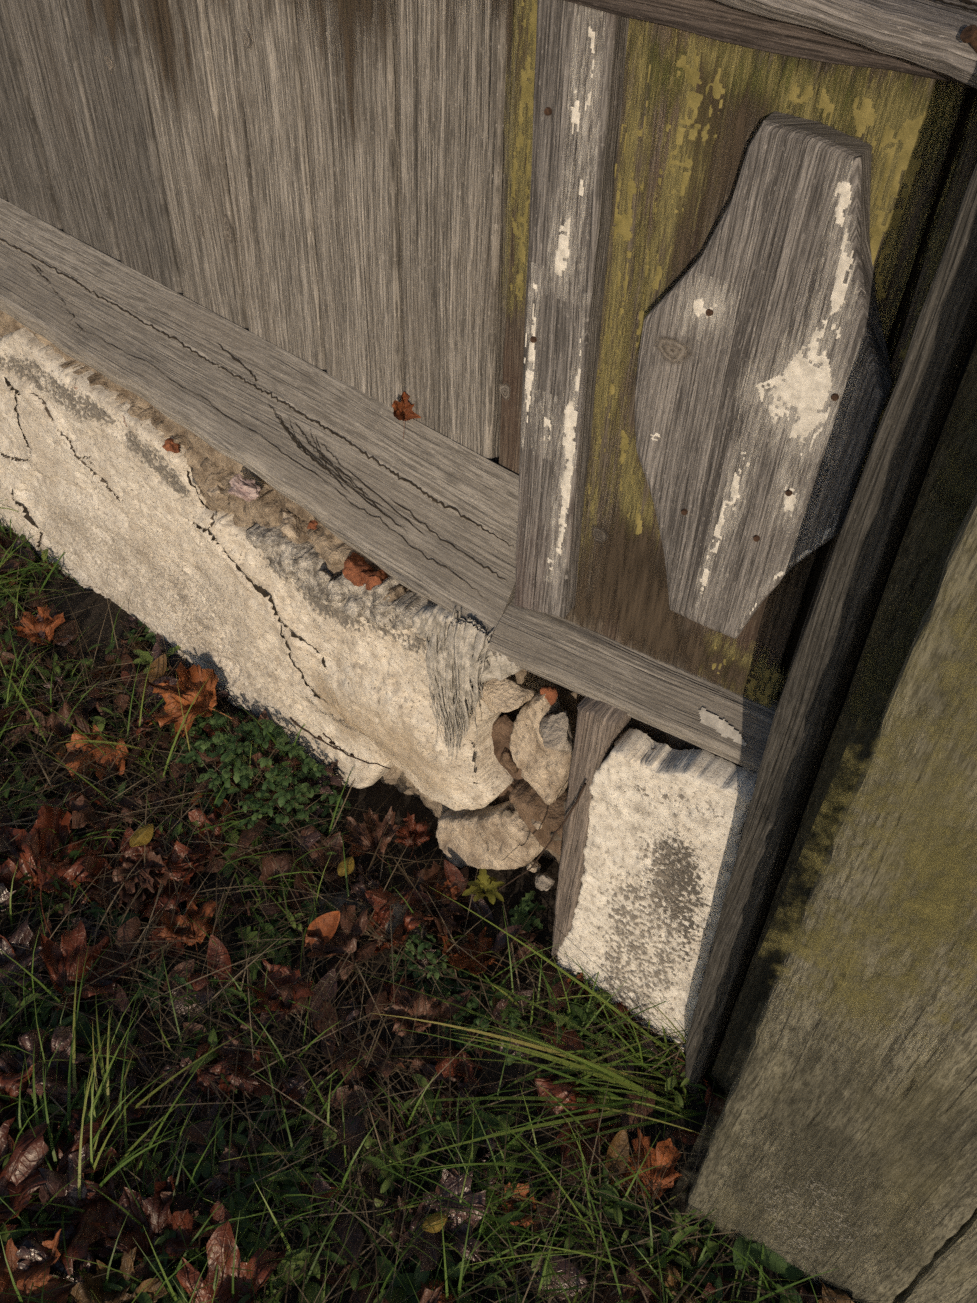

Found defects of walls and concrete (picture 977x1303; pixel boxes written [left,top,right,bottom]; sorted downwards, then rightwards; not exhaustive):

leakage [666,64,767,294]
crack [0,239,514,601]
peeling [505,0,958,619]
crack [187,471,327,703]
spalling [256,555,426,660]
peeling [698,707,747,746]
leakage [584,786,725,1024]